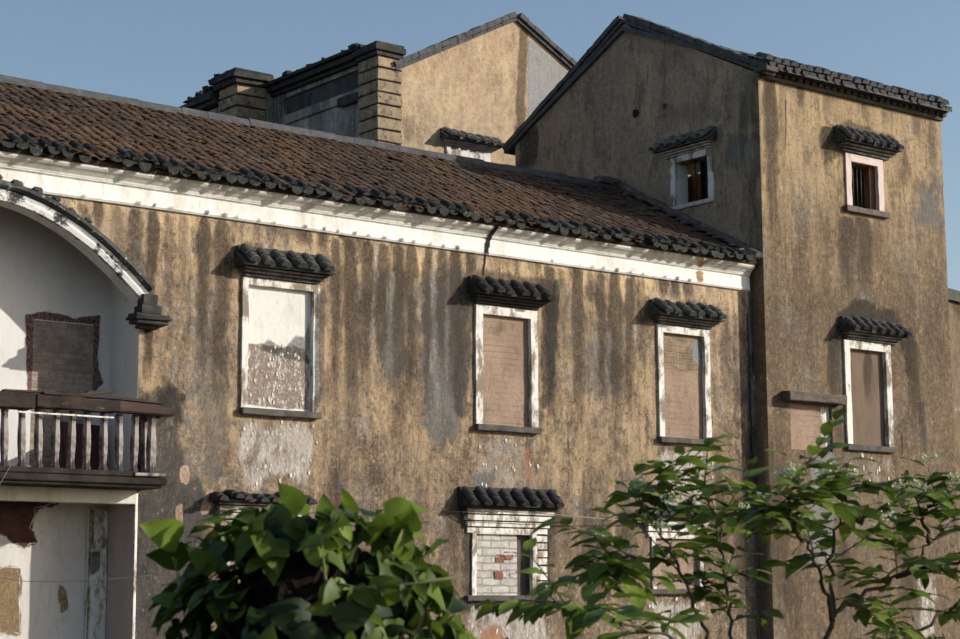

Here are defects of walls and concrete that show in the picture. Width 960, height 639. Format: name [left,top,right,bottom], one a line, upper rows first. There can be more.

leakage [515,29,527,131]
leakage [726,80,778,219]
leakage [129,209,159,295]
leakage [192,217,231,370]
flaking render [239,344,318,491]
leakage [296,229,476,446]
leakage [572,269,585,414]
leakage [596,273,634,429]
leakage [659,279,692,296]
flaking render [0,501,59,550]
flaking render [0,566,22,636]
peeling [468,607,550,639]